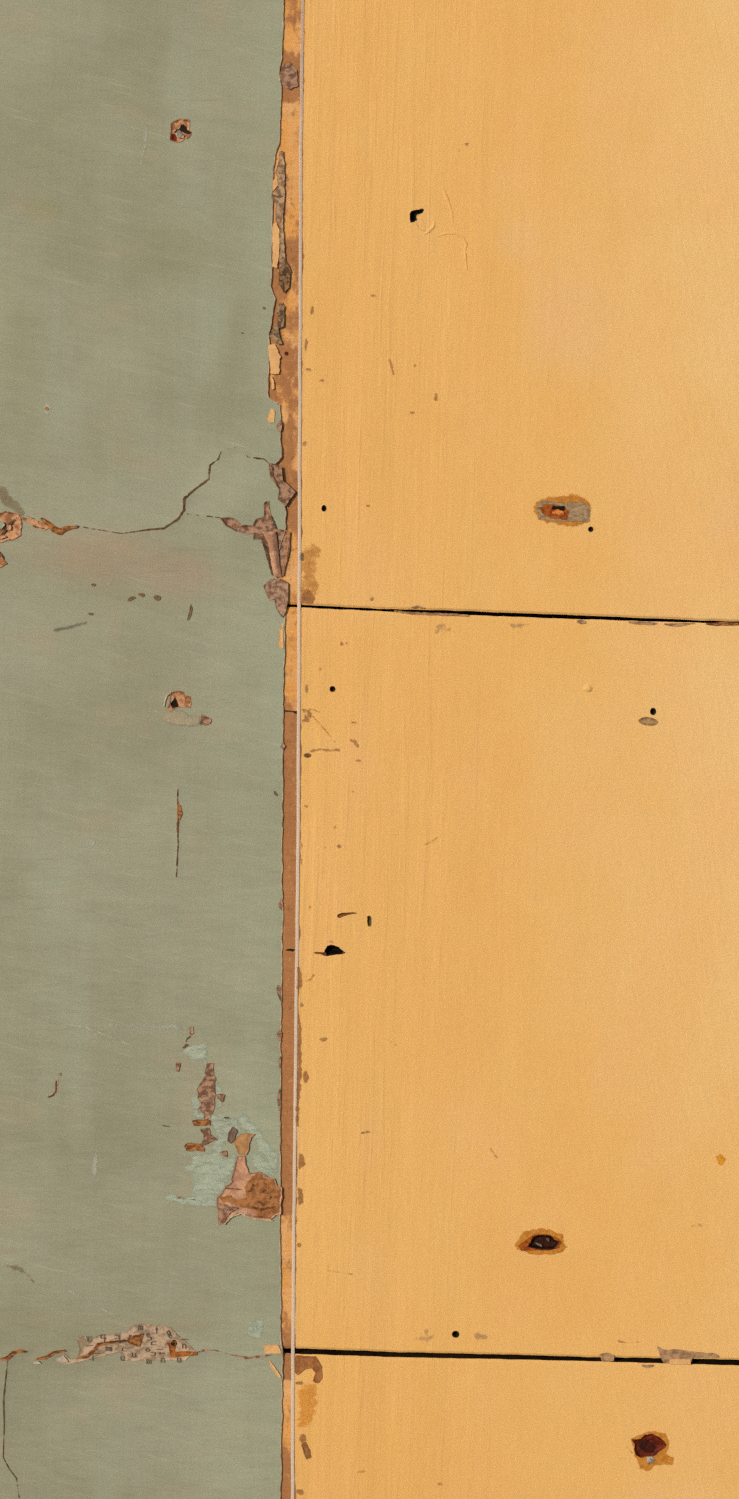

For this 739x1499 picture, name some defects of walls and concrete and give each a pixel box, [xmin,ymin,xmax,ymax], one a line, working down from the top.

crack [83,447,268,534]
rust [534,494,591,526]
peeling [0,511,78,567]
peeling [277,1020,309,1126]
peeling [165,1026,303,1225]
rust [515,1228,566,1255]
rust [631,1431,674,1471]